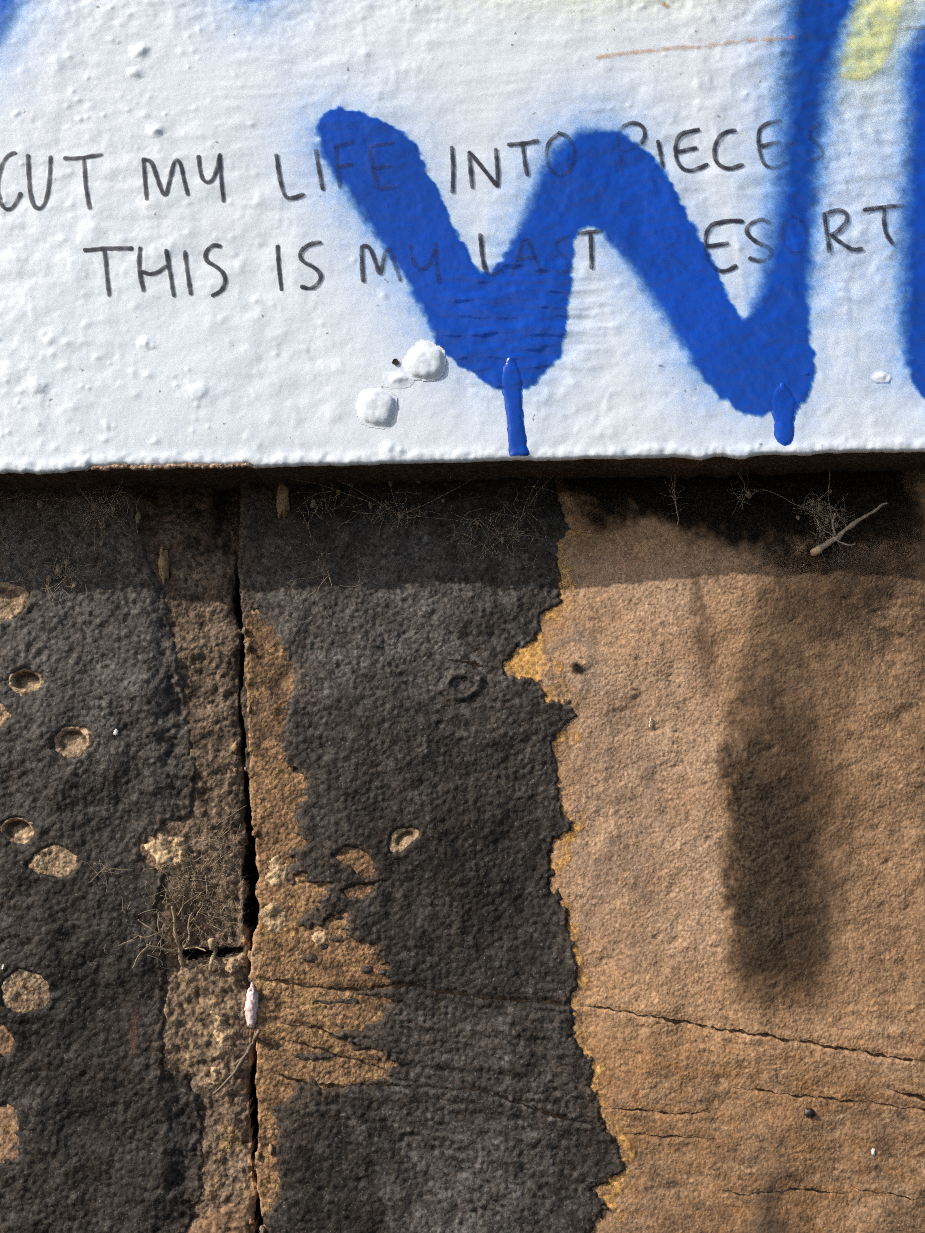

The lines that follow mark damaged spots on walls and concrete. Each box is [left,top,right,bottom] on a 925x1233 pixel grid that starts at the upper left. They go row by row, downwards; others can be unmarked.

spalling [571,662,584,674]
spalling [54,726,94,759]
crack [182,572,925,1061]
leakage [719,581,839,999]
spalling [0,817,79,877]
spalling [144,834,188,877]
spalling [162,613,393,1233]
spalling [0,964,50,1014]
peeling [0,1104,19,1163]
crack [242,1005,713,1233]
crack [732,1087,925,1111]
crack [723,1185,925,1200]